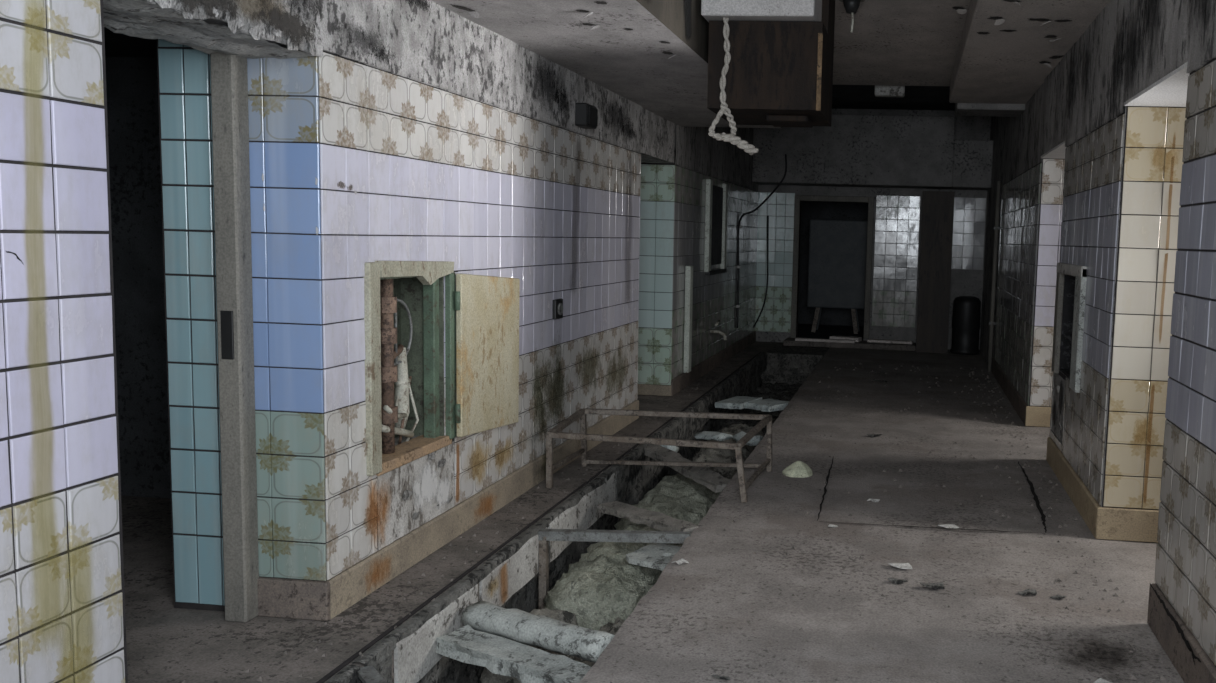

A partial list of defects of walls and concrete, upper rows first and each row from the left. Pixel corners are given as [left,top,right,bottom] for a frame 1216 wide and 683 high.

crack [817,456,1047,533]